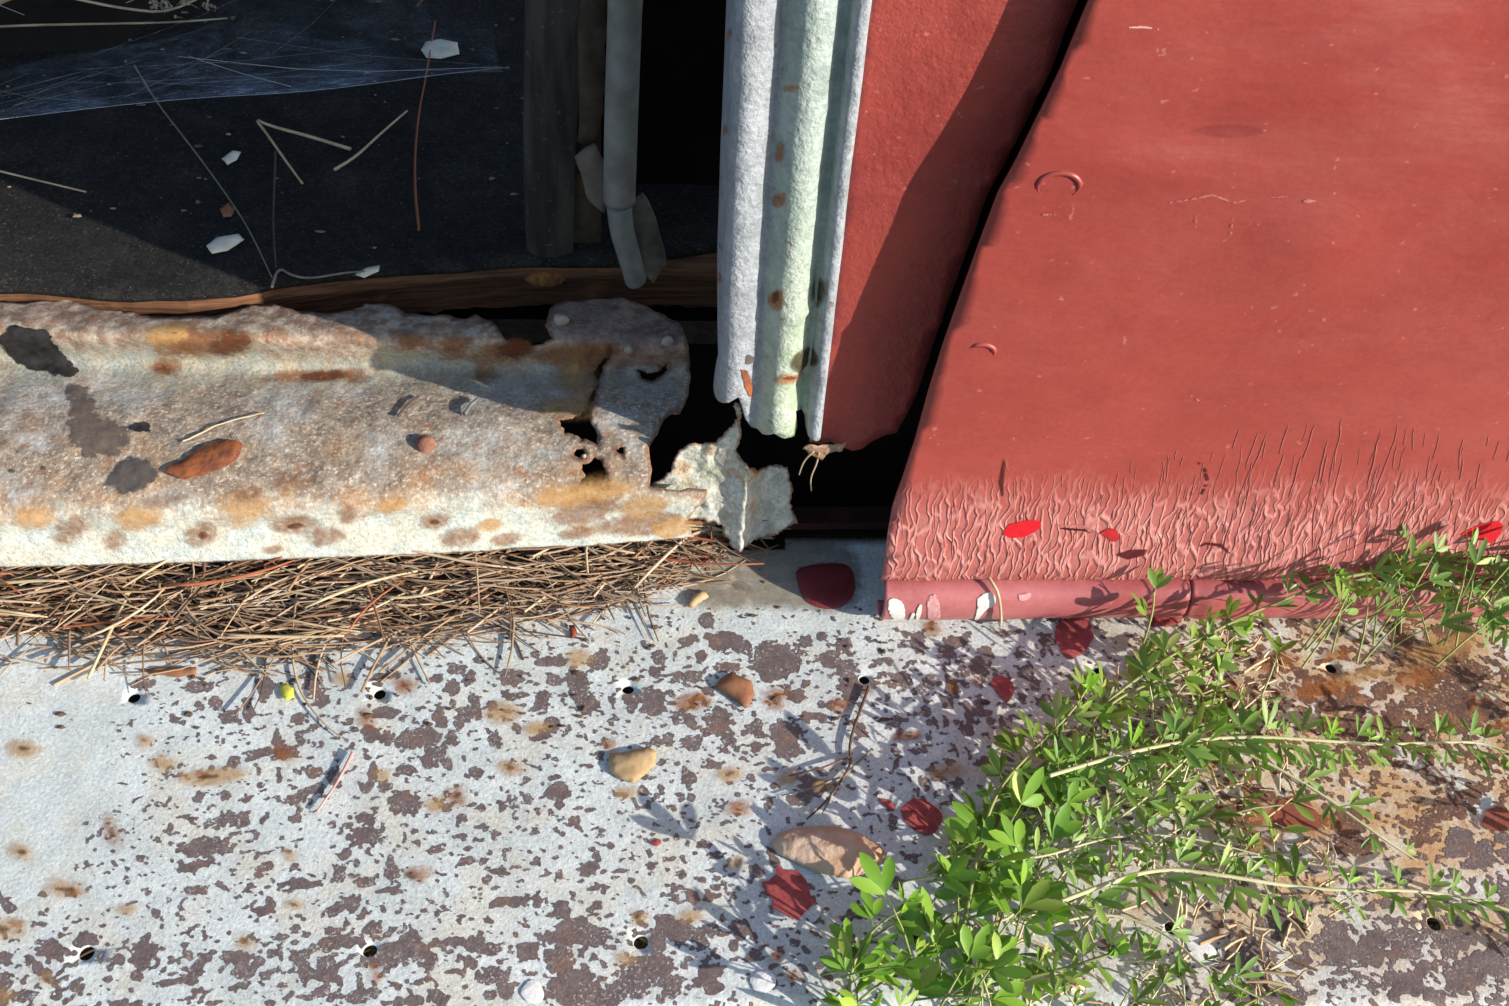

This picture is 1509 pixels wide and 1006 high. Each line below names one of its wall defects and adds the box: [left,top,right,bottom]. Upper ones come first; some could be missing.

corrosion [769,291,782,310]
corrosion [812,281,826,306]
corrosion [148,324,251,373]
corrosion [265,369,365,382]
peeling [741,355,754,397]
corrosion [776,346,818,384]
corrosion [19,509,85,543]
corrosion [109,498,178,548]
corrosion [186,524,214,545]
corrosion [267,507,354,554]
corrosion [424,515,519,546]
peeling [0,592,1509,1006]